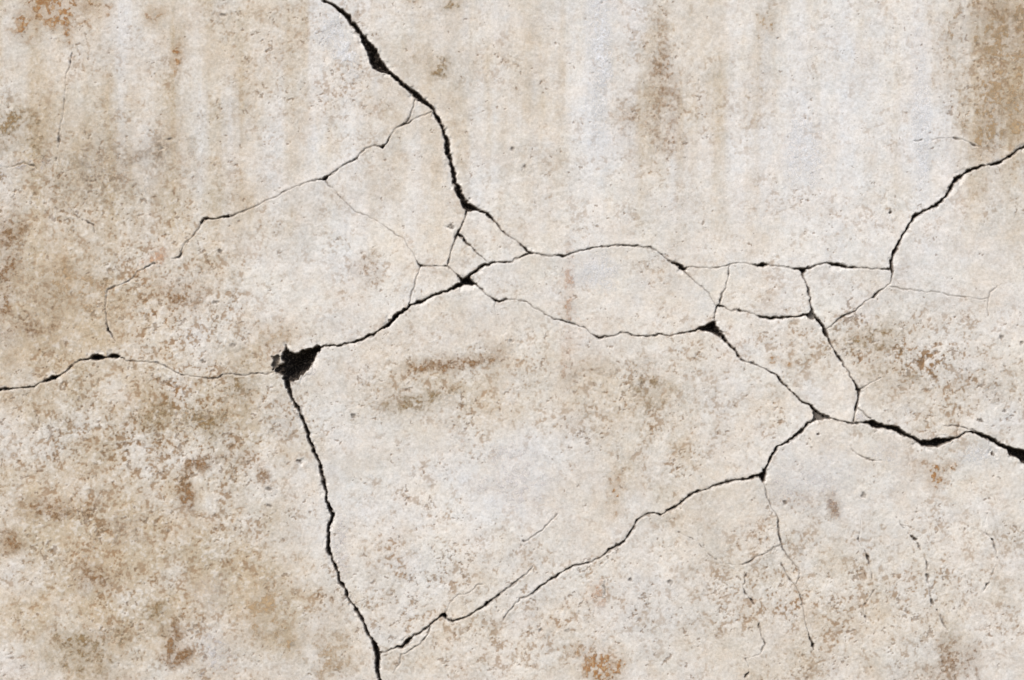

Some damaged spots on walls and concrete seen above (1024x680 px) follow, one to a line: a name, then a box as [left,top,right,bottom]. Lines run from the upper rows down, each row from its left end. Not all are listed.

crack [12,52,74,170]
crack [71,209,95,233]
crack [0,262,275,392]
crack [172,0,1024,651]
crack [744,622,766,678]